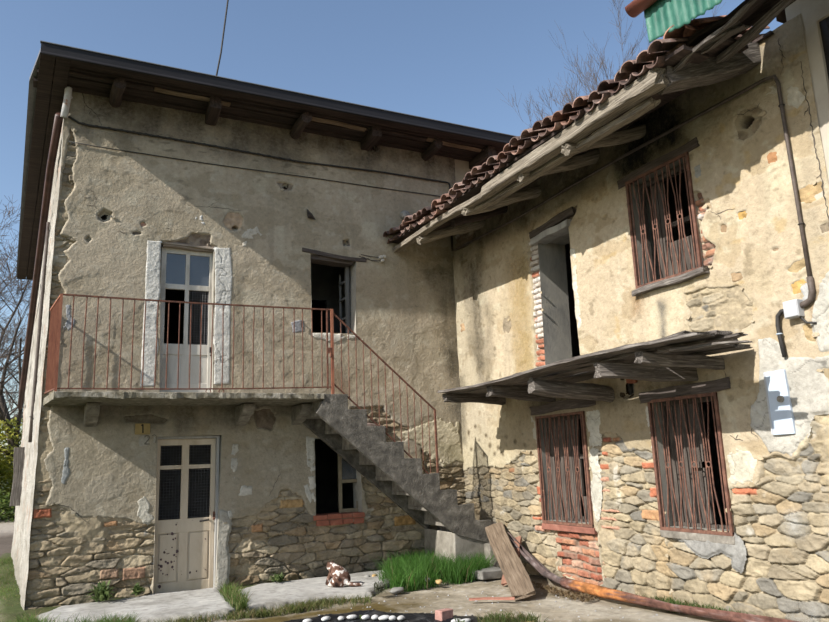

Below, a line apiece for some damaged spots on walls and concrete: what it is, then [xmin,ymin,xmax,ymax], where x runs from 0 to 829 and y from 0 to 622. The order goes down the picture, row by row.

flaking render [733,102,766,141]
crack [778,39,829,220]
flaking render [695,193,712,220]
flaking render [699,230,716,268]
flaking render [685,272,754,338]
flaking render [803,271,829,352]
flaking render [24,126,206,610]
flaking render [223,436,437,587]
flaking render [421,410,829,622]